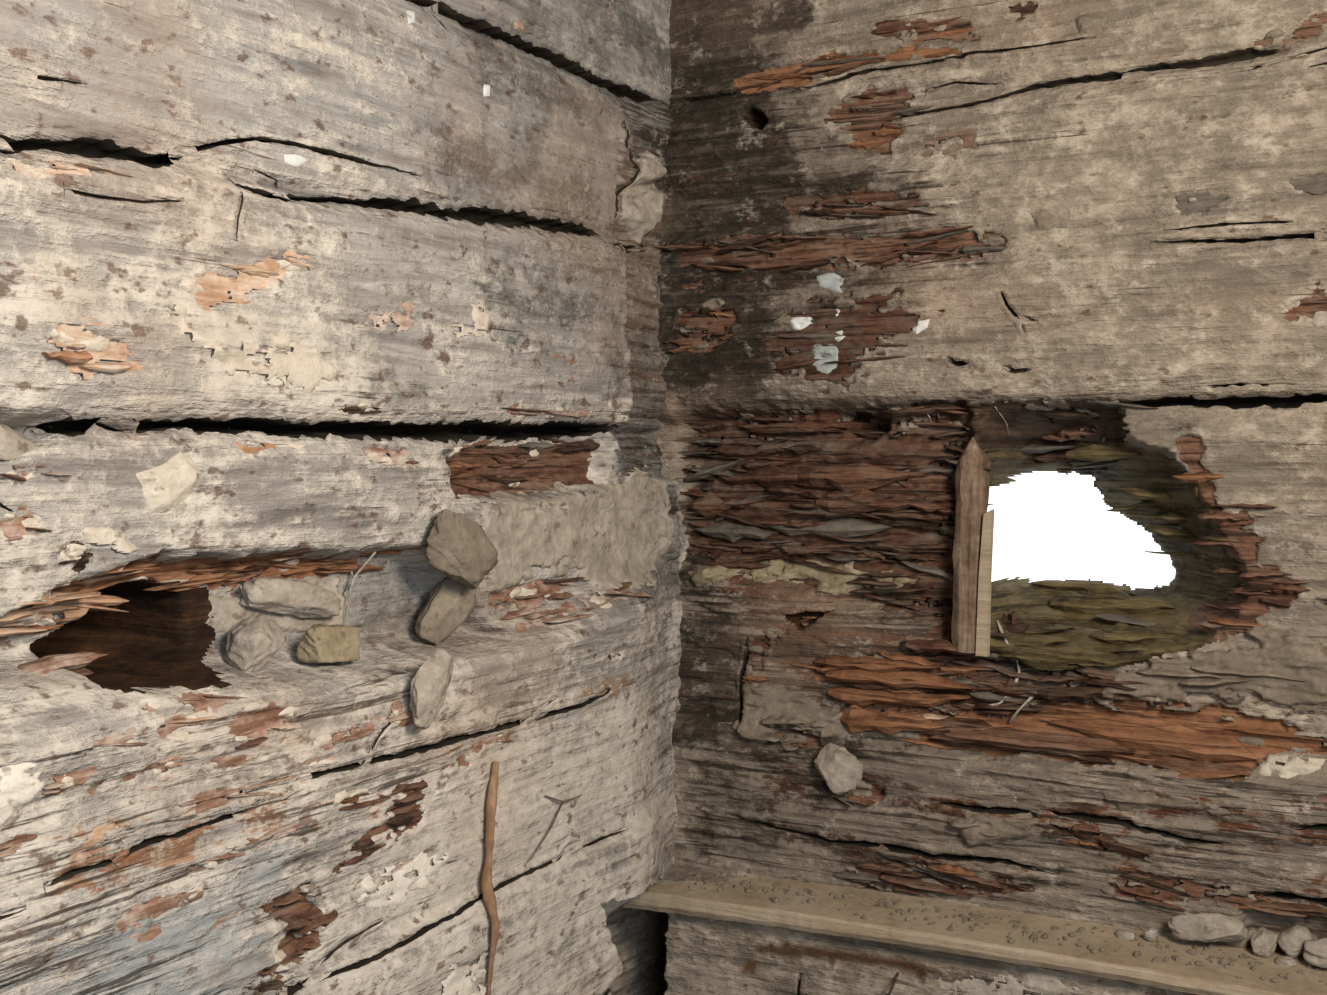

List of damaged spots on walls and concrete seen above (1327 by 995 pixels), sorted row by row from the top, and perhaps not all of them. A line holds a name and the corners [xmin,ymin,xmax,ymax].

crack [0,0,738,259]
crack [786,32,1327,124]
peeling [764,273,945,394]
spalling [445,438,600,501]
spalling [983,435,1247,685]
spalling [0,527,427,858]
spalling [249,882,338,992]
crack [0,676,622,931]
spalling [331,780,428,874]
crack [272,820,633,995]
crack [724,793,1231,896]
crack [1247,882,1327,909]